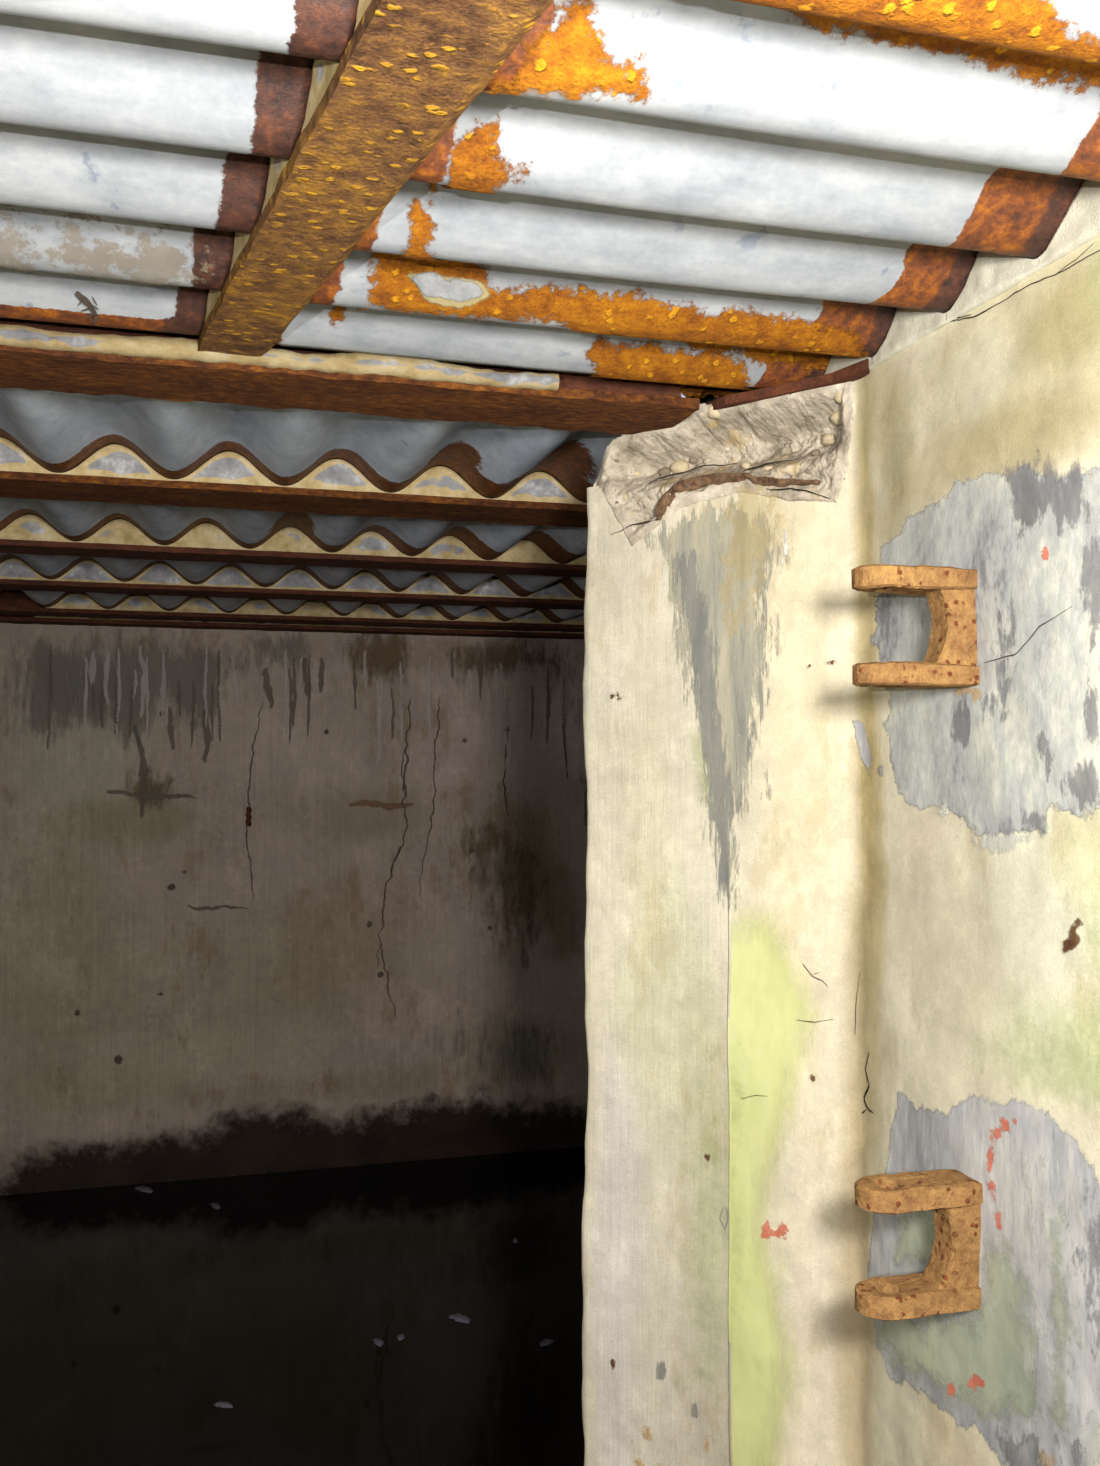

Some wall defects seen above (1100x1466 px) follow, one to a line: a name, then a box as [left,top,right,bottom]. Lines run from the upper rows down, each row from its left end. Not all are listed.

corrosion [482,0,652,105]
corrosion [732,0,1100,96]
corrosion [329,114,872,399]
water stain [16,633,239,817]
water stain [254,633,324,742]
water stain [350,634,407,767]
water stain [450,642,570,793]
water stain [644,497,788,911]
peeling [853,464,1100,854]
crack [376,699,440,1017]
peeling [868,1092,1100,1466]